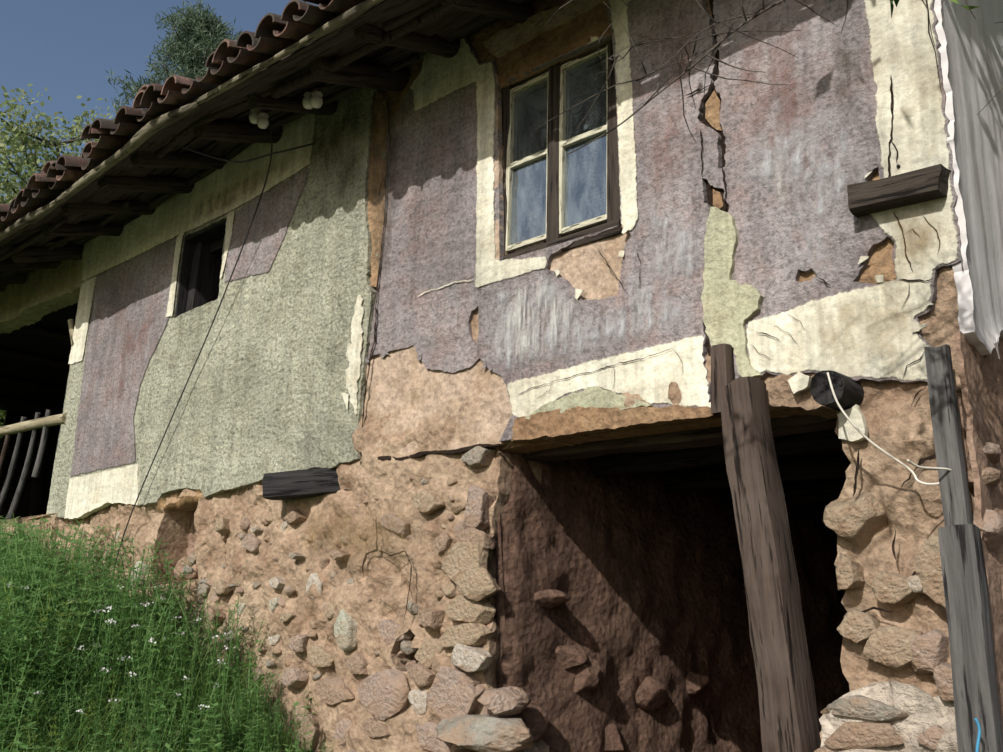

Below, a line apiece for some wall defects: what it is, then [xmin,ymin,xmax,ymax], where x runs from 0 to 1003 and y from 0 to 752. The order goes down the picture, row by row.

peeling [469,0,612,89]
crack [686,0,729,212]
crack [888,77,898,177]
crack [360,126,391,428]
crack [419,278,476,296]
peeling [550,223,631,301]
spalling [857,238,896,284]
crack [893,212,940,308]
crack [360,444,502,465]
crack [362,518,412,619]